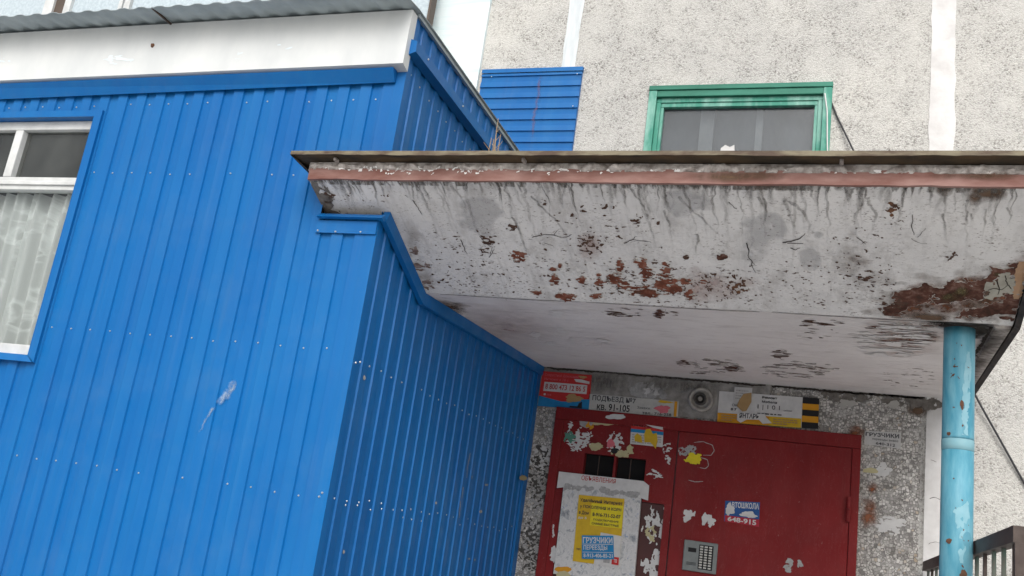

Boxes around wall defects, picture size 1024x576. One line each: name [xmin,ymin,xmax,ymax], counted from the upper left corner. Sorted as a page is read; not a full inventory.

water stain [894,186,1017,204]
spalling [984,262,1024,300]